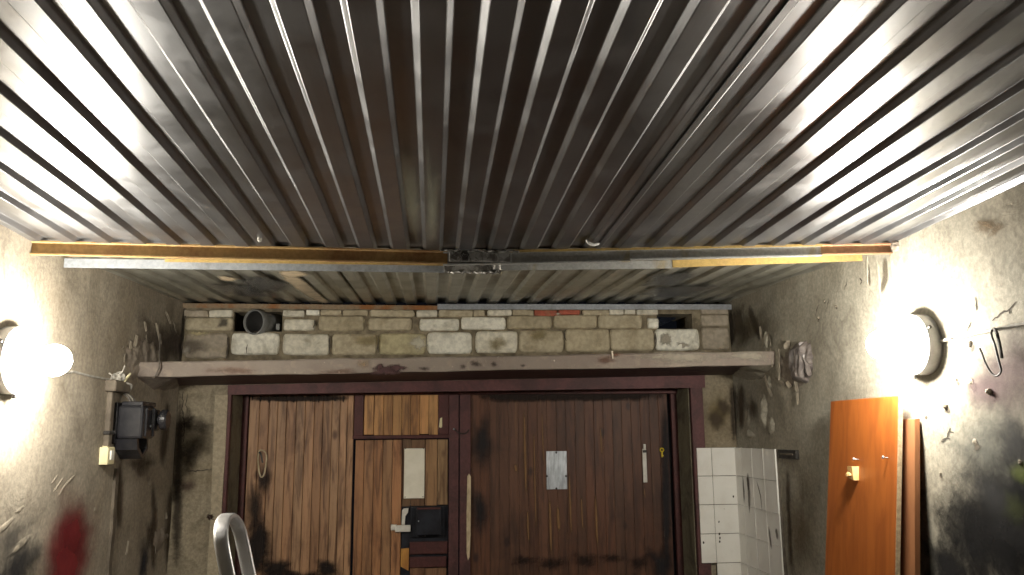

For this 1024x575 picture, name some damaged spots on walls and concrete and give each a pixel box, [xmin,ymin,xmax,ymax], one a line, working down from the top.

peeling [122,312,176,380]
peeling [759,326,813,404]
leakage [711,386,755,438]
leakage [133,404,207,575]